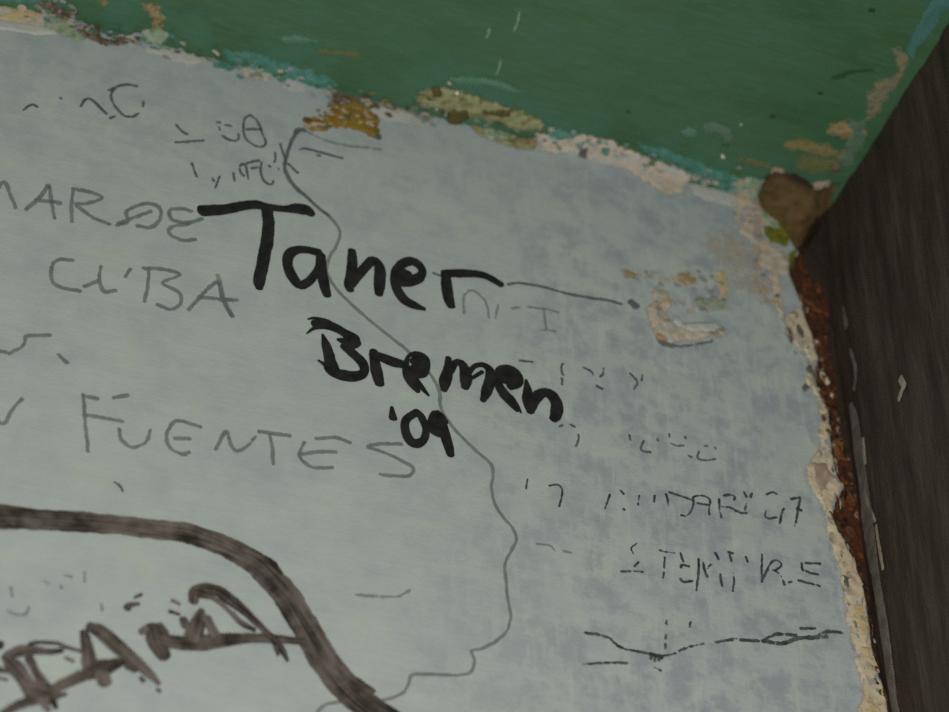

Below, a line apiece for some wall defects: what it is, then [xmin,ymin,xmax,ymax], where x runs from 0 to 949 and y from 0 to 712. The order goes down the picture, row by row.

peeling [0,0,347,105]
rust [302,92,382,140]
peeling [347,46,909,712]
rust [789,220,889,712]